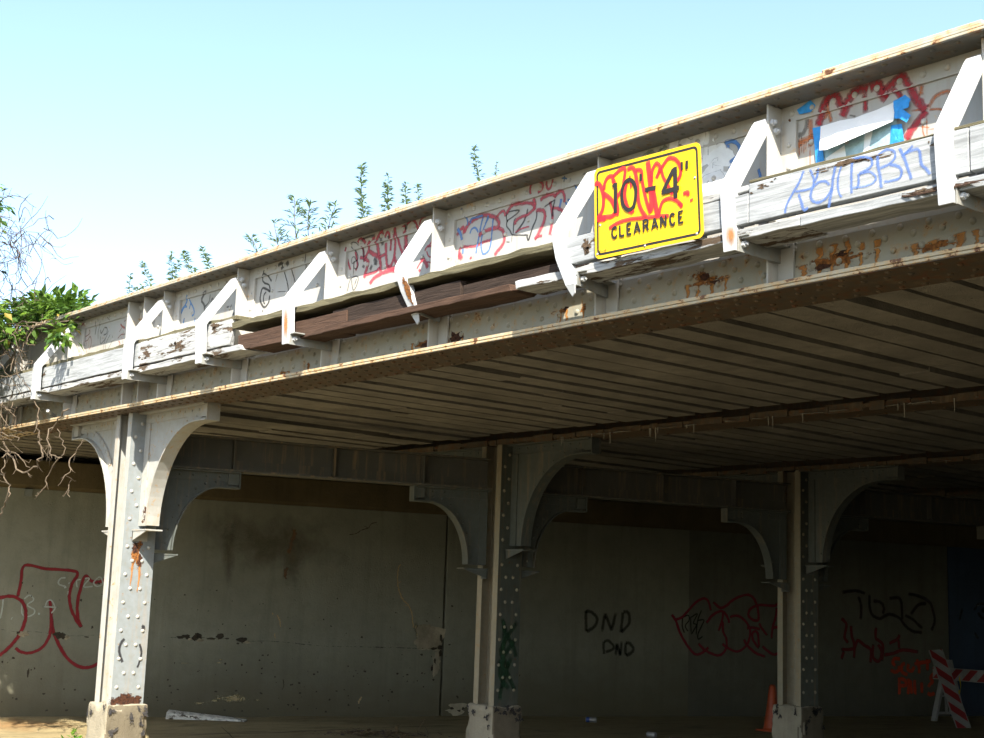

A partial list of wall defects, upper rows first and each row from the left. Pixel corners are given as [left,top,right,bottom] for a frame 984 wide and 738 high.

rust [796,239,881,276]
rust [910,229,980,256]
rust [685,270,728,298]
rust [130,541,143,591]